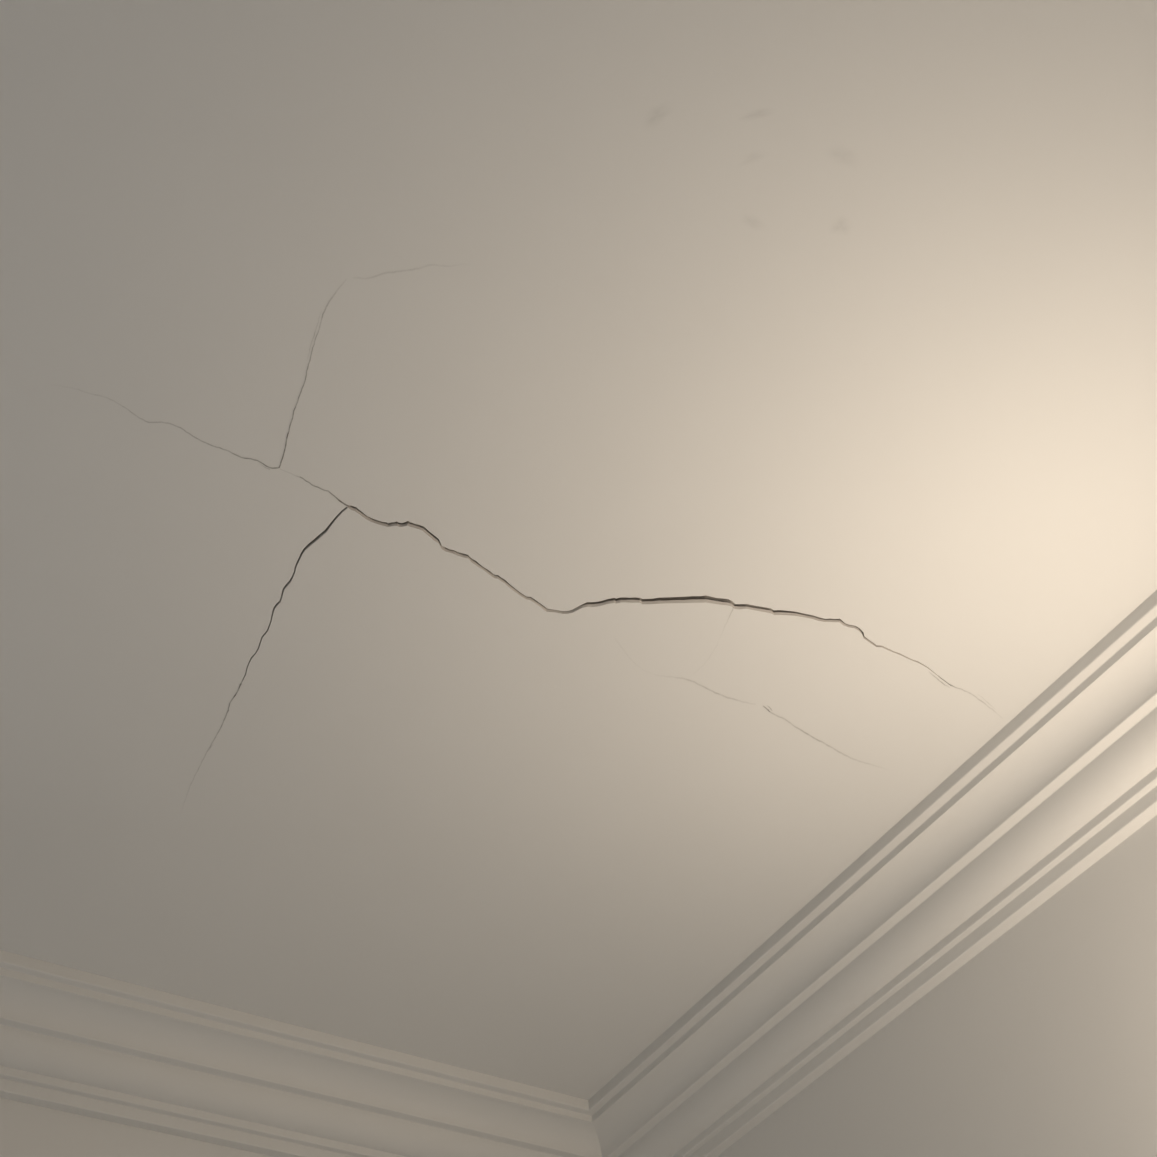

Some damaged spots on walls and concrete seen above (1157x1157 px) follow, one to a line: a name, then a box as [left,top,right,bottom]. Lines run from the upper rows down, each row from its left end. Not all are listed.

crack [233,486,951,698]